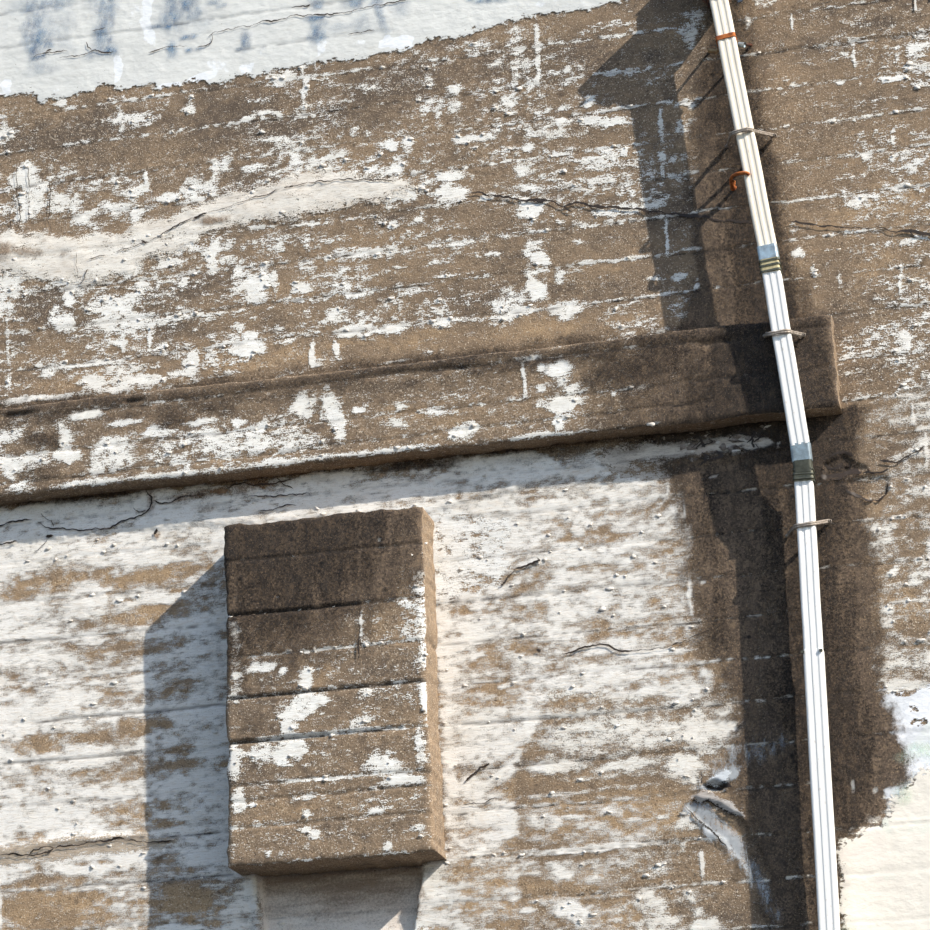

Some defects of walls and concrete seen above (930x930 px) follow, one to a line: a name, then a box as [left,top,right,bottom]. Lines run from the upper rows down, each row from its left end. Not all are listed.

peeling [738,0,778,29]
peeling [0,6,714,495]
damp [0,11,785,430]
crack [470,191,753,224]
crack [789,221,930,236]
damp [19,491,131,505]
crack [0,478,309,553]
damp [224,507,425,685]
peeling [0,405,784,930]
damp [629,421,818,930]
damp [729,3,912,897]
peeling [835,786,907,837]